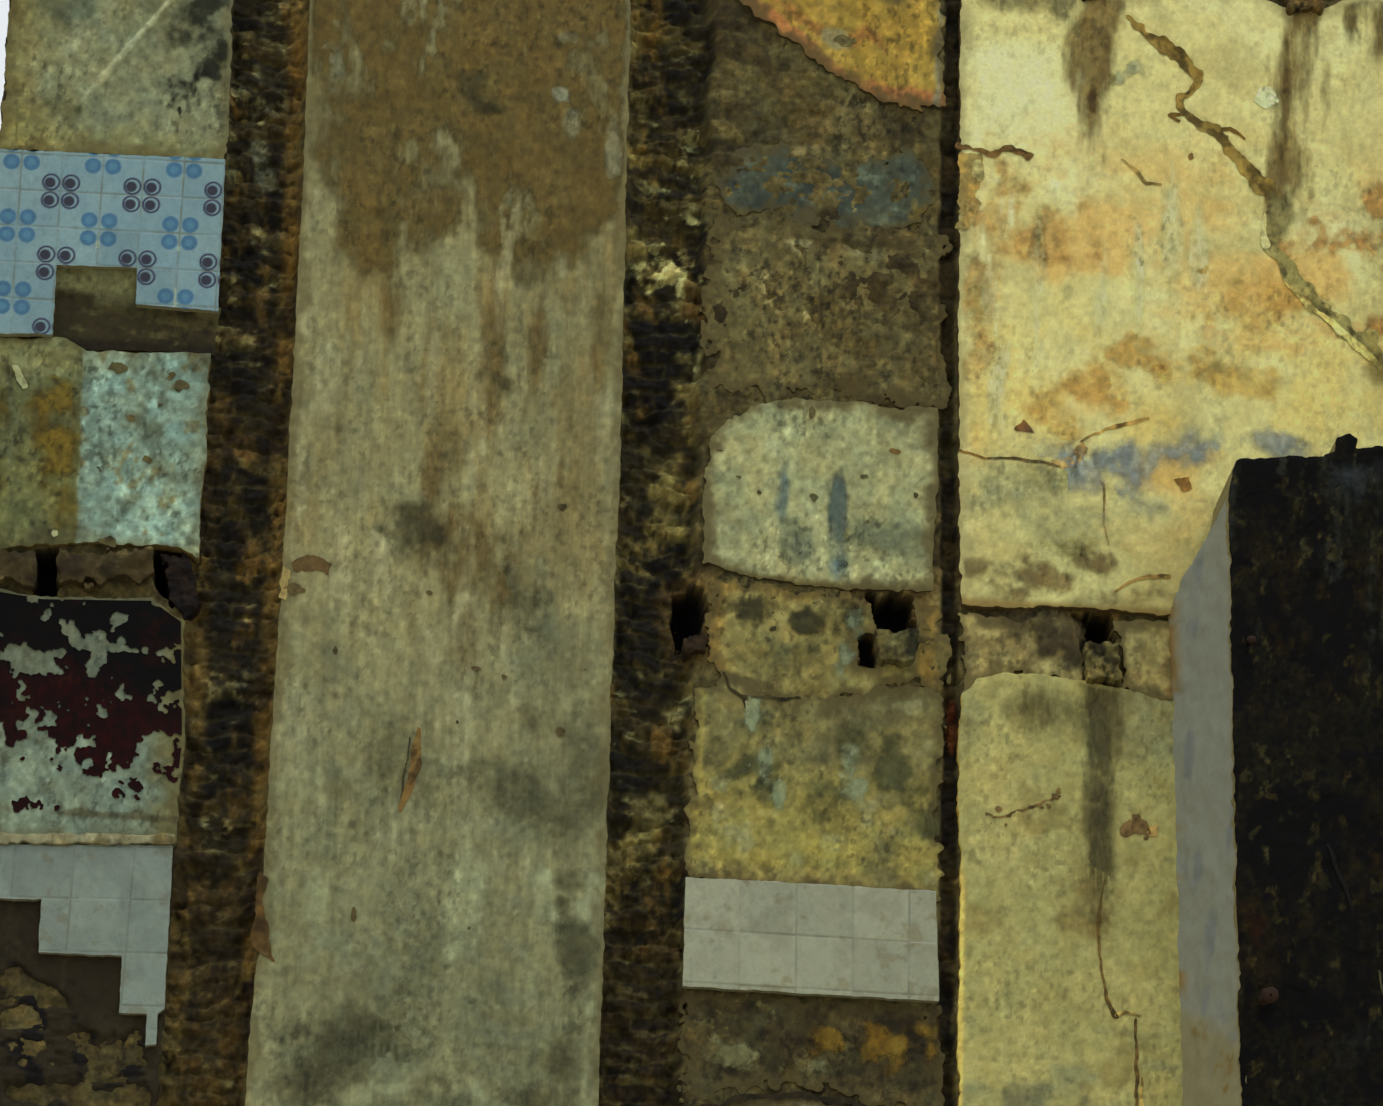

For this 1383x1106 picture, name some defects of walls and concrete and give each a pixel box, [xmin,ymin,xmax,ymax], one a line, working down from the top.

leakage [312,0,627,319]
peeling [834,34,857,46]
leakage [993,0,1122,135]
crack [1121,15,1383,381]
leakage [1267,12,1318,196]
leakage [1344,3,1383,54]
peeling [0,592,182,800]
peeling [11,795,60,813]
crack [981,787,1061,826]
leakage [1082,687,1118,896]
crack [1096,879,1144,1106]